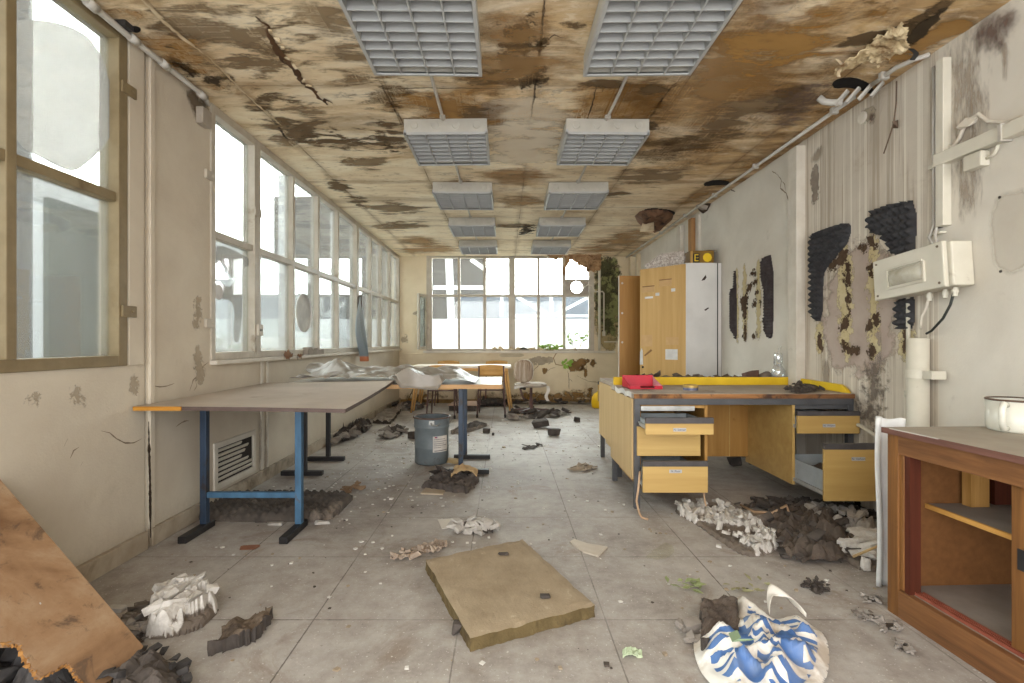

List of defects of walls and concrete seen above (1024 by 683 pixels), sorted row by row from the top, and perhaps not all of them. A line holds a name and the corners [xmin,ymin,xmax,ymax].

crack [255,16,332,105]
damp [104,2,564,170]
crack [531,1,561,116]
damp [567,0,870,205]
damp [885,13,1013,67]
damp [328,179,458,253]
peeling [866,234,879,278]
peeling [740,268,762,341]
peeling [828,249,881,361]
spalling [568,358,596,393]
damp [855,357,888,432]
crack [103,422,152,538]